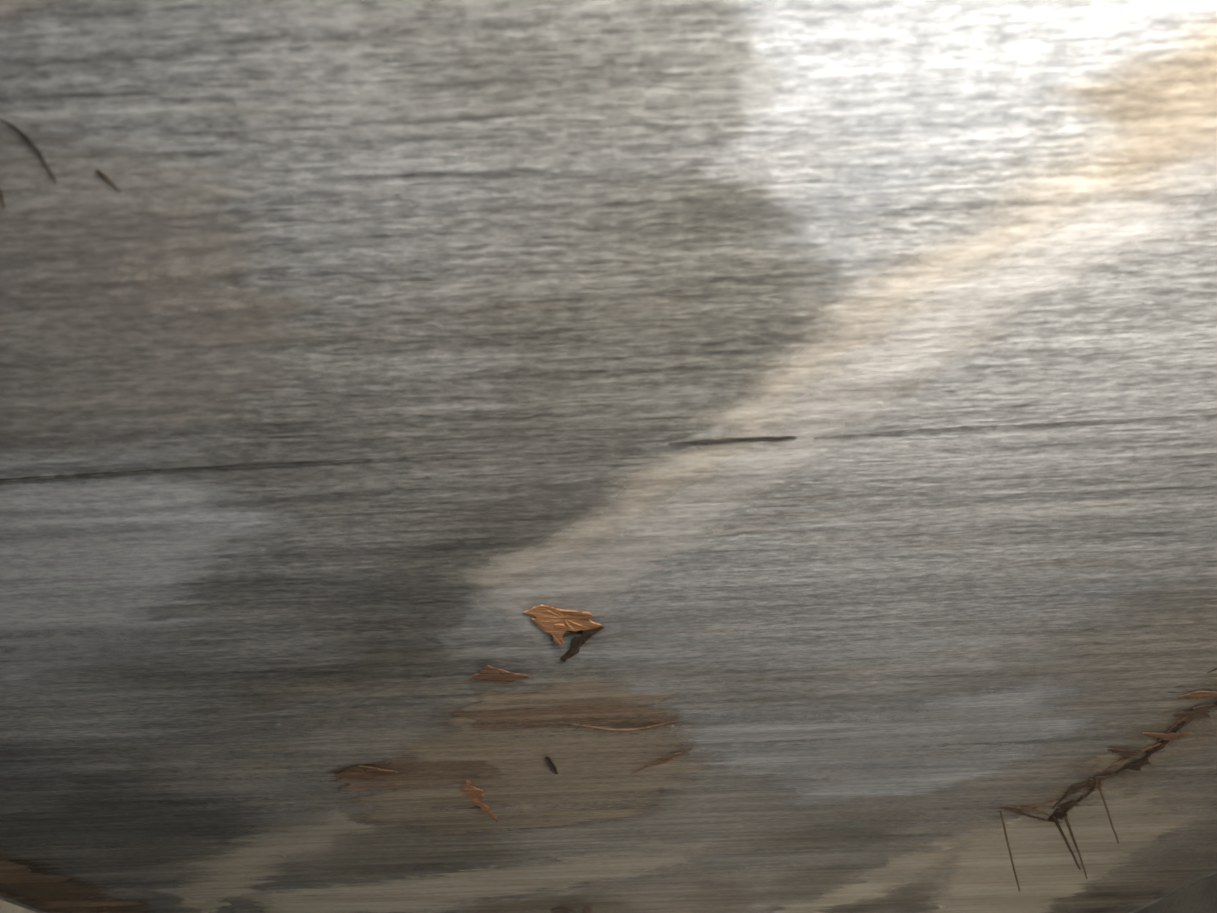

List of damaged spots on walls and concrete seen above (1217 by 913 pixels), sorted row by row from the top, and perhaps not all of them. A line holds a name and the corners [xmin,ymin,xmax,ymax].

leakage [460,53,1217,643]
crack [0,453,461,483]
crack [669,414,1217,444]
leakage [0,481,285,633]
peeling [532,618,604,662]
leakage [0,594,1217,913]